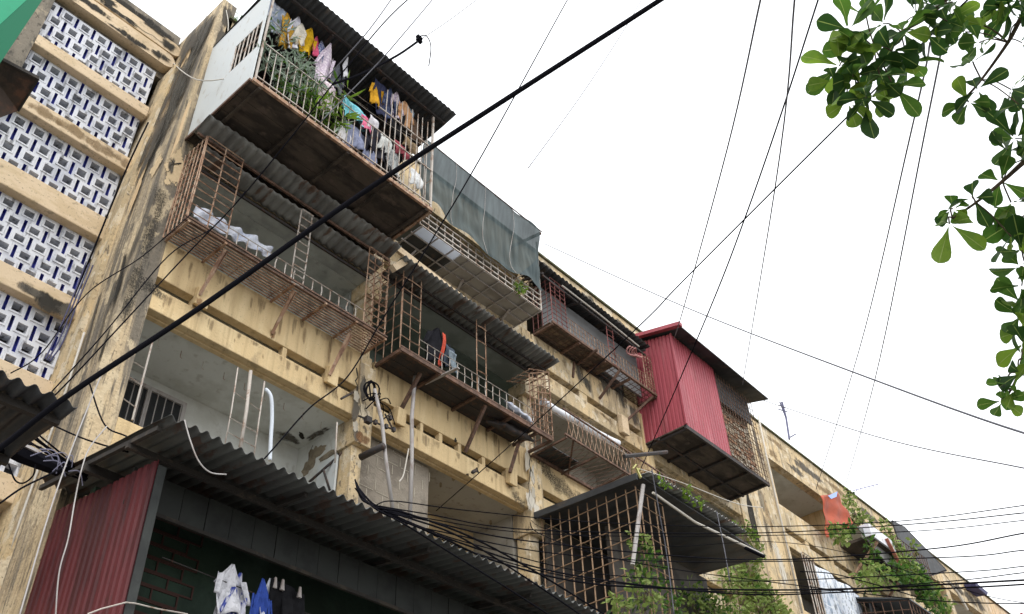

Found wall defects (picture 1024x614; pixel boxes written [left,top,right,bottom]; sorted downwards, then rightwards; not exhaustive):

leakage [31,0,232,179]
leakage [18,282,75,318]
leakage [80,186,166,365]
peeling [299,432,340,477]